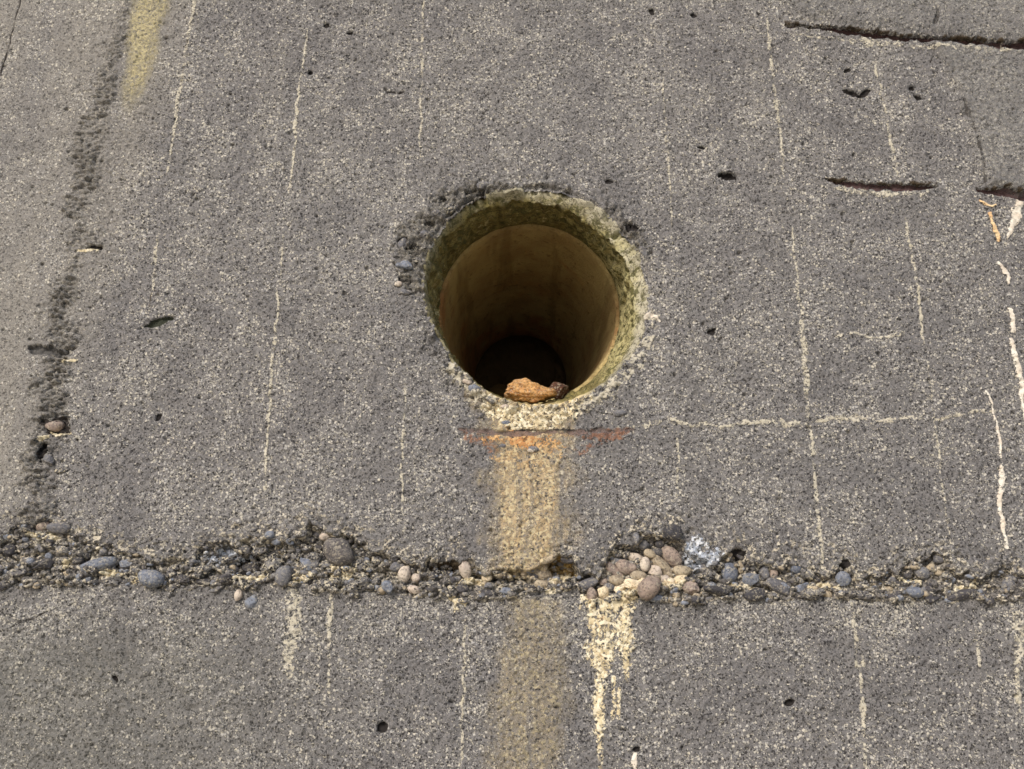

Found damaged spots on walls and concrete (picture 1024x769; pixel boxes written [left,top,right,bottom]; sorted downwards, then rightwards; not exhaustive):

crack [932,8,940,24]
corrosion [480,391,593,577]
leakage [577,589,638,768]